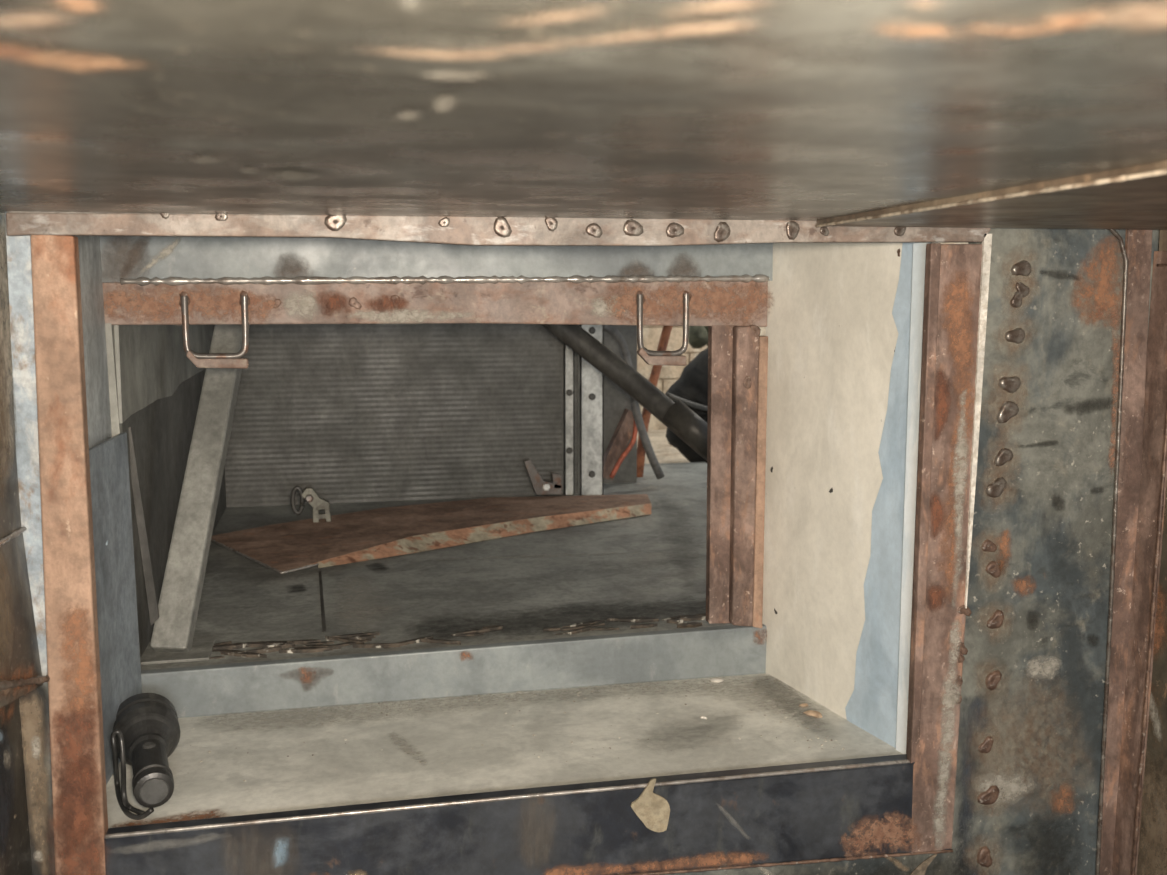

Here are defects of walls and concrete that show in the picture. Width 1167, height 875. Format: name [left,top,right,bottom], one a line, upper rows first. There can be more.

rust [104,285,279,322]
rust [321,294,347,314]
rust [370,296,405,311]
rust [605,282,771,324]
rust [1072,238,1123,468]
rust [930,276,975,609]
rust [1149,694,1161,738]
rust [53,609,104,875]
rust [842,814,920,856]
rust [1137,754,1167,875]
rust [545,853,758,875]